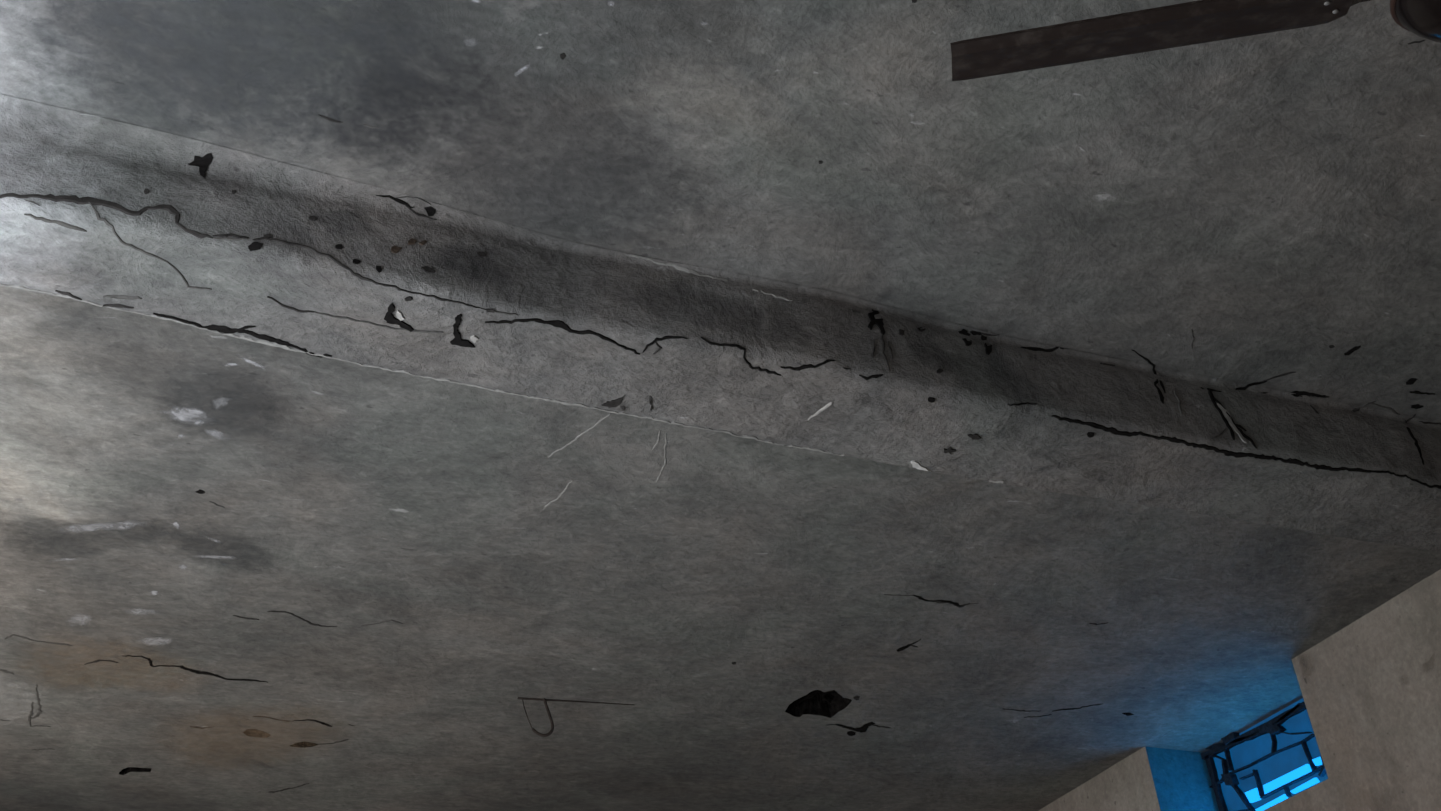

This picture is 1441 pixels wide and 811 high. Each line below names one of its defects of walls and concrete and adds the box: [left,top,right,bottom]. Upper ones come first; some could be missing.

spalling [188,153,213,178]
spalling [248,233,271,251]
spalling [335,244,382,273]
peeling [625,254,728,282]
crack [0,193,893,380]
crack [1020,345,1064,353]
peeling [0,283,844,456]
crack [1008,350,1441,489]
crack [884,594,978,608]
crack [233,611,403,627]
crack [0,634,354,751]
spalling [785,690,890,736]